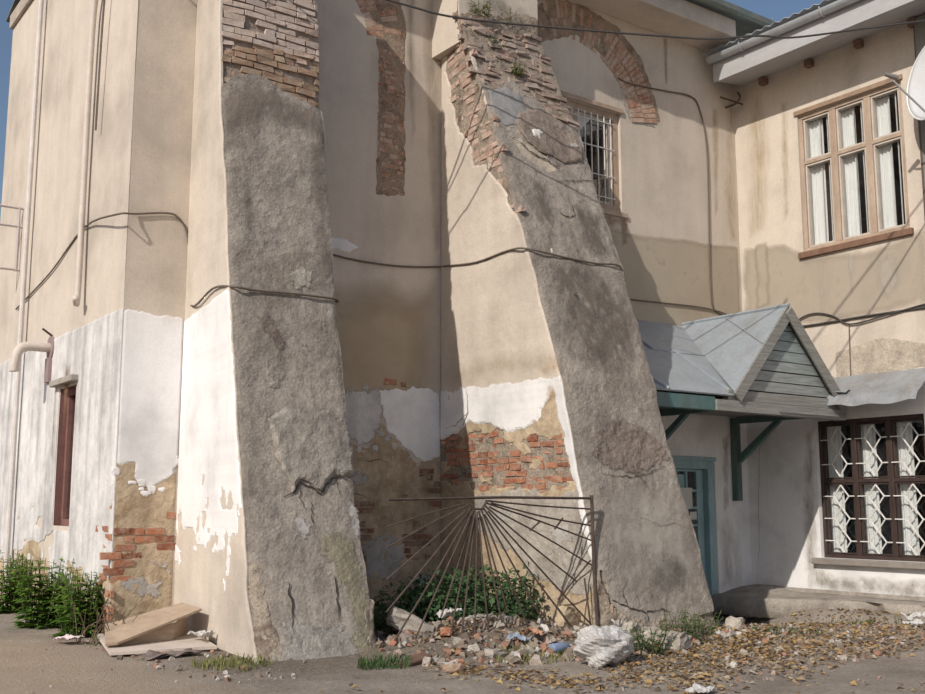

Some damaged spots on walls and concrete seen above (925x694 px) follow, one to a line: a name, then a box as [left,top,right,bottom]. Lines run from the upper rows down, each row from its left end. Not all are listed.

flaking render [222,44,320,114]
spalling [447,12,557,213]
peeling [0,456,179,633]
crack [284,459,388,531]
flaking render [247,386,711,661]
crack [287,582,295,629]
crack [333,575,341,620]
crack [613,581,673,623]